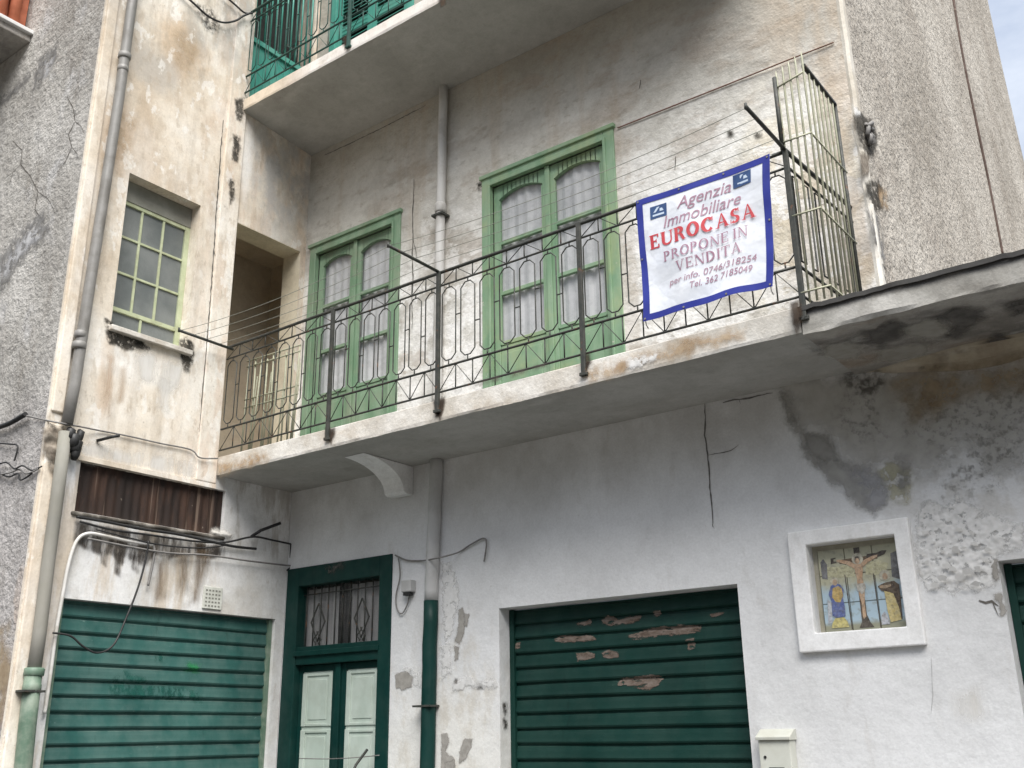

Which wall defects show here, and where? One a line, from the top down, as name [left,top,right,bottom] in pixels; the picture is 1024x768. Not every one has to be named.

crack [9,141,54,215]
crack [59,97,84,170]
water stain [232,135,240,162]
water stain [235,98,244,121]
water stain [105,318,194,407]
water stain [865,321,907,347]
crack [704,393,770,529]
water stain [784,370,1024,500]
peeling [915,495,1024,616]
peeling [441,563,497,691]
peeling [395,668,422,690]
peeling [441,733,472,768]